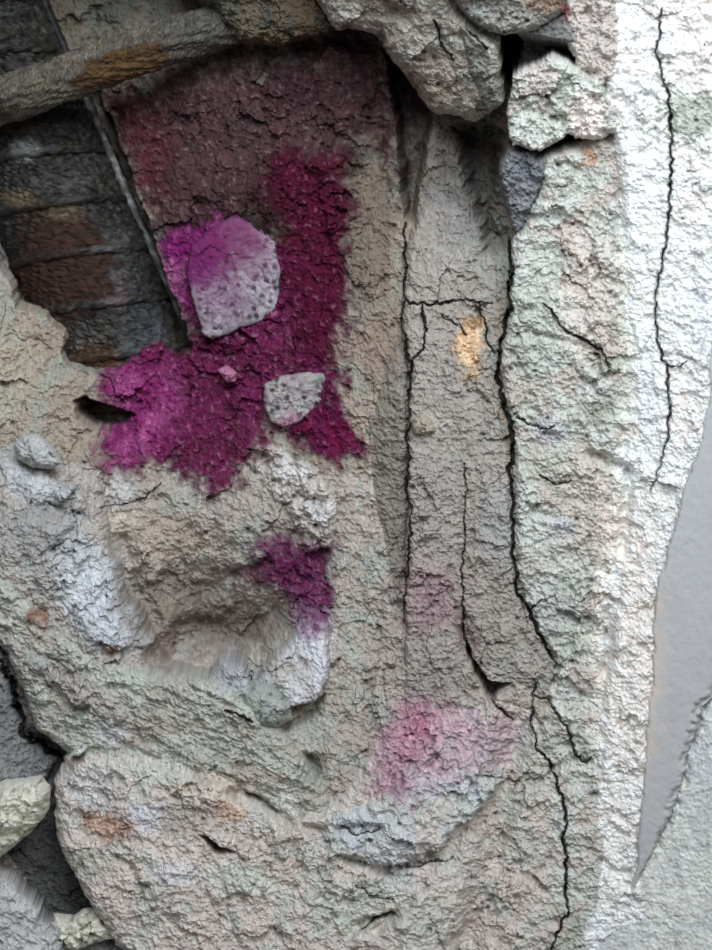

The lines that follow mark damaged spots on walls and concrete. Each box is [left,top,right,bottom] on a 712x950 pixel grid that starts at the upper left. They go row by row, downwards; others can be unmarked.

rust [9,217,124,322]
spalling [0,0,202,76]
rust [68,42,177,92]
spalling [0,29,427,373]
spalling [81,394,365,668]
spalling [327,213,359,438]
crack [401,224,559,665]
crack [544,304,610,368]
flaking render [563,0,712,950]
crack [650,8,686,491]
crack [0,660,93,943]
crack [491,675,591,950]